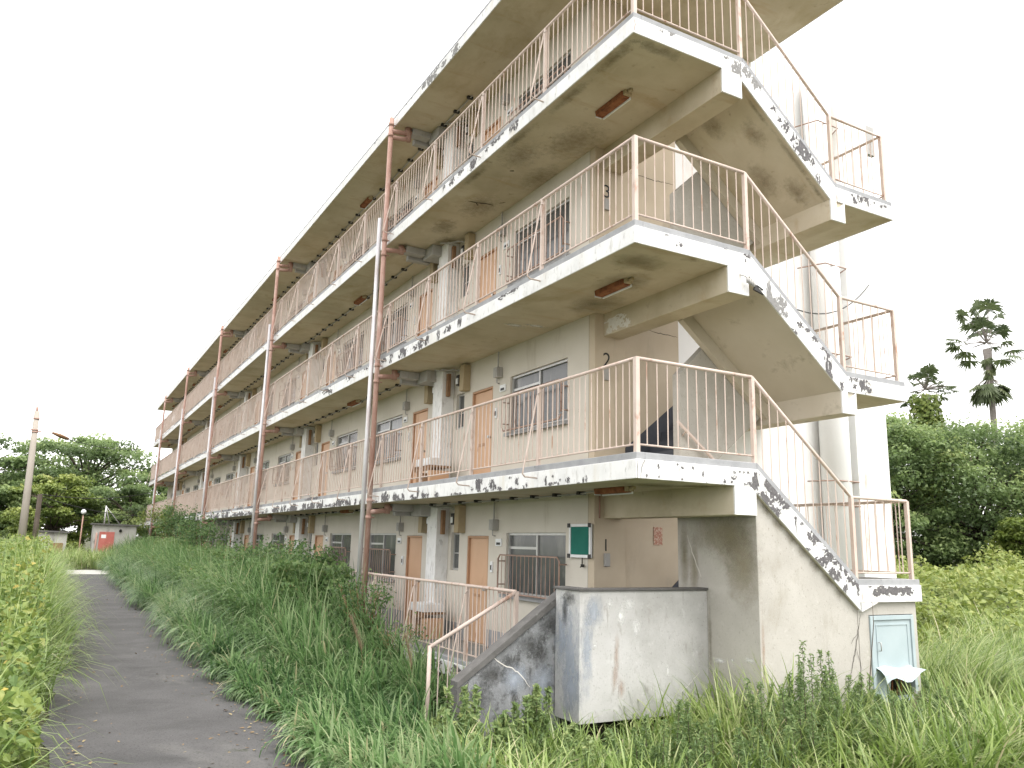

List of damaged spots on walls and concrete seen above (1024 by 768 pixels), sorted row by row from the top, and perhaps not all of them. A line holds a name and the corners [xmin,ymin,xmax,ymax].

peeling [724,56,762,91]
peeling [444,119,519,187]
peeling [770,105,821,184]
peeling [381,318,462,363]
spalling [604,313,631,335]
peeling [764,280,872,394]
peeling [724,470,914,597]
damp [547,596,596,703]